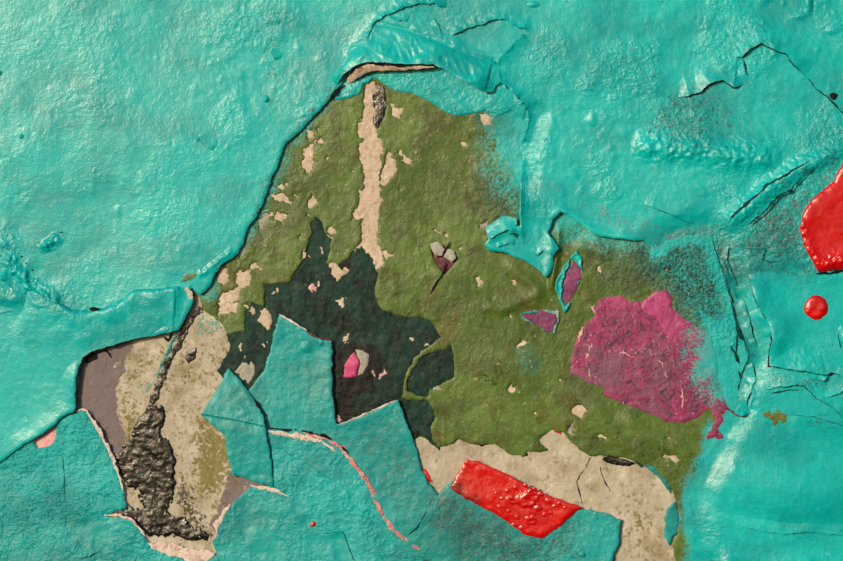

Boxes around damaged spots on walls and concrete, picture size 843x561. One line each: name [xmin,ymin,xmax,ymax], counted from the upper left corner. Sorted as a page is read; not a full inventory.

crack [678,0,843,114]
crack [643,191,696,225]
peeling [6,286,187,388]
peeling [78,13,751,561]
crack [713,240,843,450]